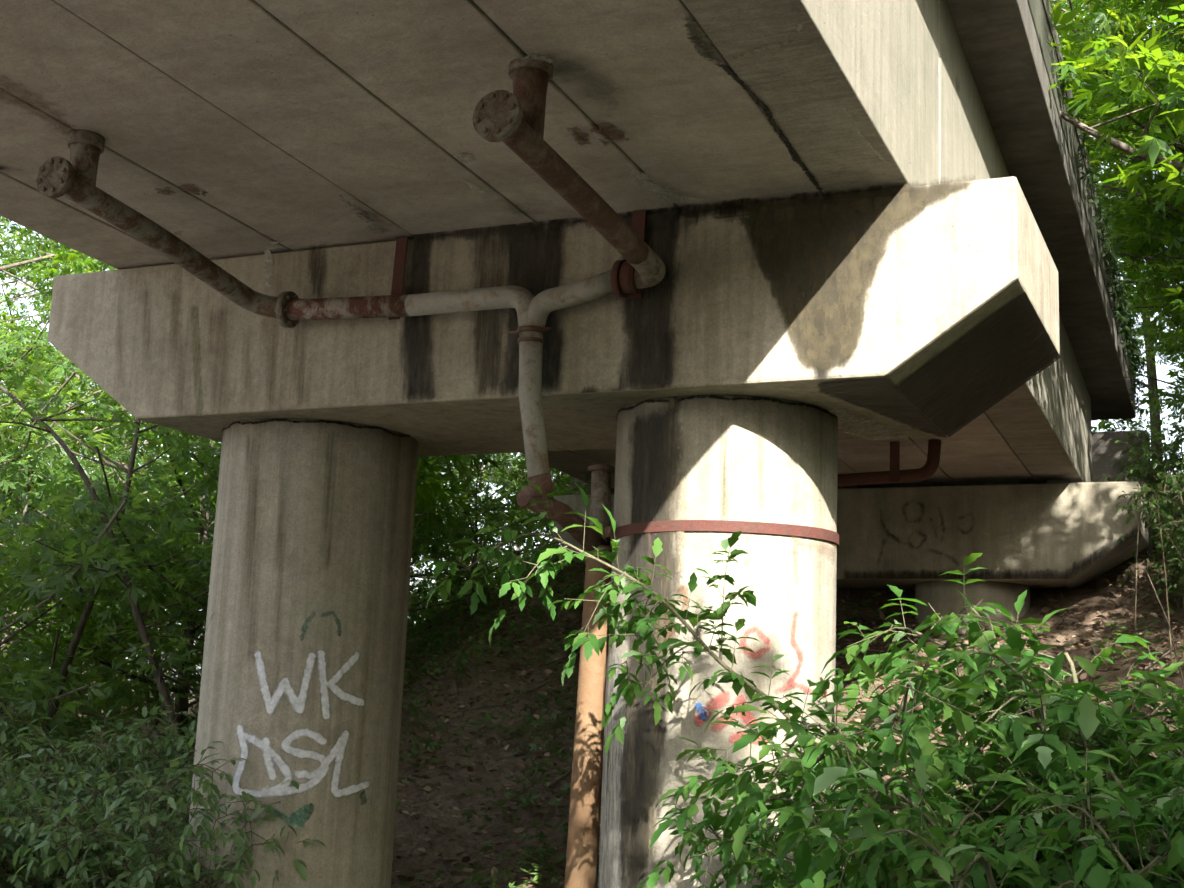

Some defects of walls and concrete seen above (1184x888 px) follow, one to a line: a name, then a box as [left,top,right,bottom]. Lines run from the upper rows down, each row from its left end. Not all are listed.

corrosion [573,123,629,144]
crack [719,64,823,190]
leakage [407,219,591,297]
leakage [402,315,434,400]
leakage [474,308,519,394]
leakage [541,311,563,390]
leakage [599,167,1061,888]